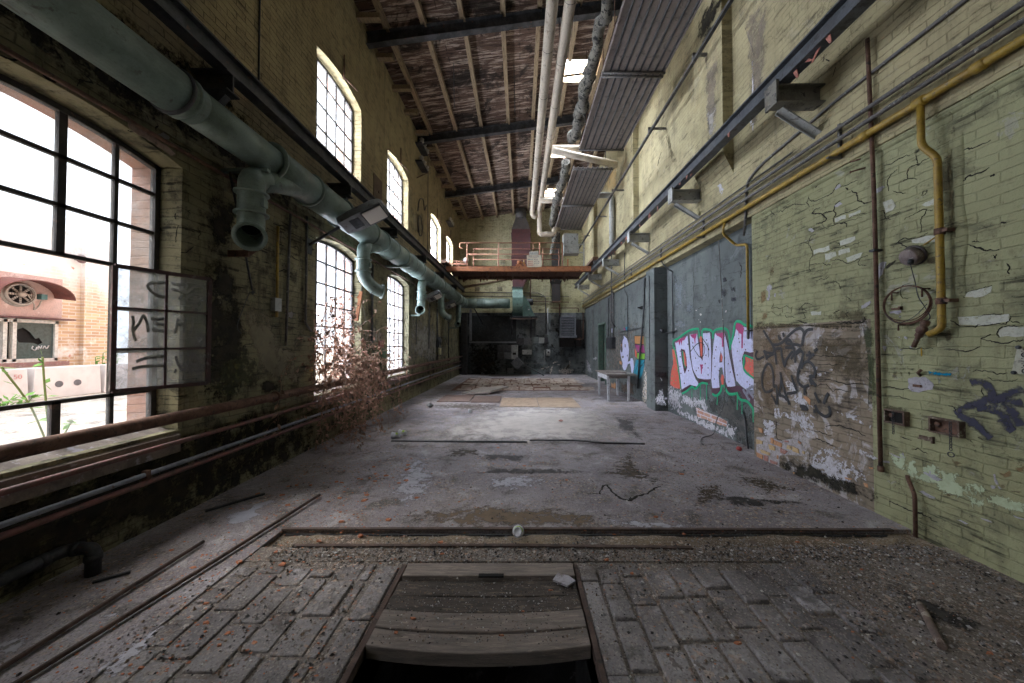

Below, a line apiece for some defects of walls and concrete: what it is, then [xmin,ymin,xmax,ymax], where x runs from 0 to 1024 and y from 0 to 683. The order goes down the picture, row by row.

flaking render [876,186,896,213]
flaking render [813,237,863,262]
crack [771,140,995,324]
flaking render [912,235,935,243]
leakage [190,261,248,403]
crack [902,241,1024,395]
flaking render [696,408,727,426]
spalling [756,427,805,465]
leakage [806,447,878,482]
crack [593,484,661,501]